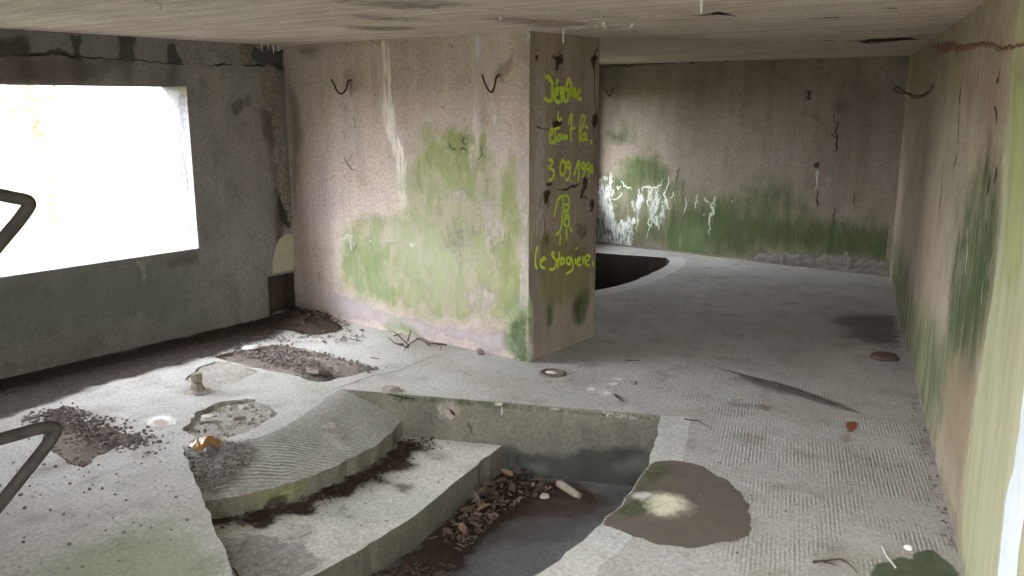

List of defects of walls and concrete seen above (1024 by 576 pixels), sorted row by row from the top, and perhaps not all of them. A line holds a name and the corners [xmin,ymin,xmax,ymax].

leakage [70,35,82,60]
leakage [118,36,136,60]
crack [4,48,265,67]
leakage [168,44,182,64]
leakage [381,36,407,212]
crack [831,121,839,152]
leakage [596,172,715,245]
leakage [836,316,896,342]
spalling [437,401,461,420]